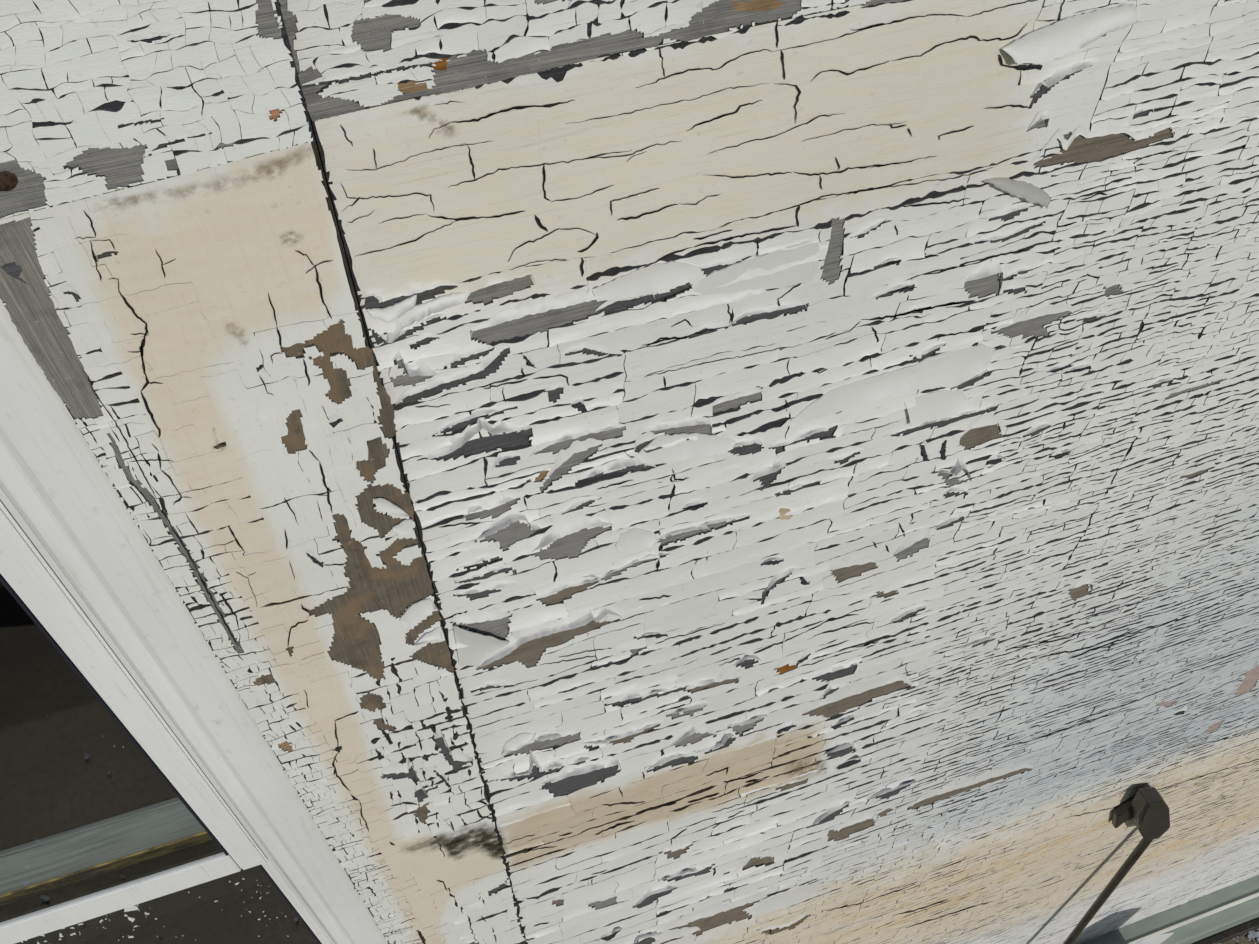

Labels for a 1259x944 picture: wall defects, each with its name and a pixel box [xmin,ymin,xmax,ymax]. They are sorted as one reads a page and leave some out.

peeling [1001,4,1174,166]
peeling [0,158,103,418]
crack [259,293,310,395]
crack [296,0,1065,387]
peeling [968,178,1054,243]
crack [1061,193,1107,227]
crack [75,210,257,647]
crack [284,451,333,646]
peeling [280,217,1107,823]
peeling [633,842,774,908]
peeling [634,881,820,944]
peeling [807,764,1034,841]